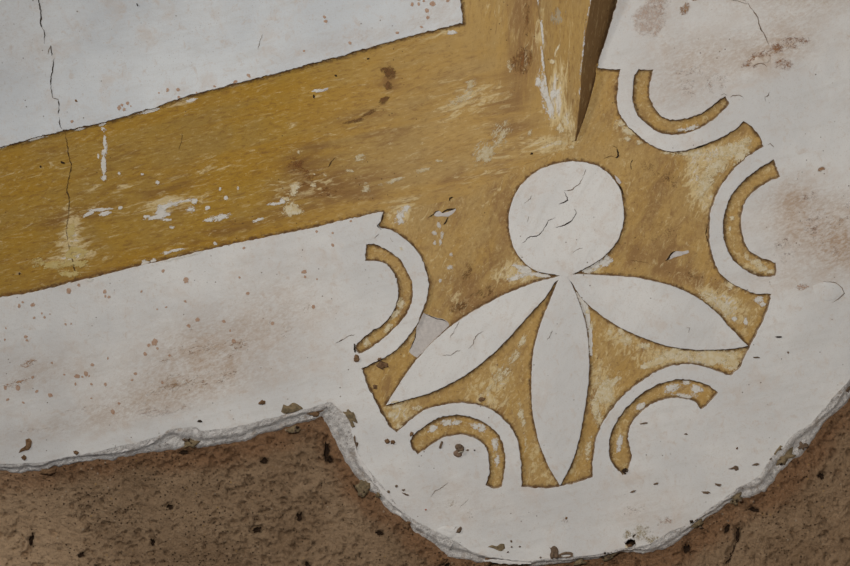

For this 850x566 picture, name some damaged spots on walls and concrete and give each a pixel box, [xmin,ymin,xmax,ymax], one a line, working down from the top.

crack [38,0,75,271]
peeling [97,123,108,180]
peeling [83,206,123,217]
peeling [143,198,229,229]
peeling [267,182,303,218]
crack [524,170,586,242]
peeling [31,221,93,294]
peeling [141,248,199,273]
peeling [665,250,689,261]
peeling [409,313,449,357]
peeling [607,328,741,371]
flaking render [0,375,850,566]